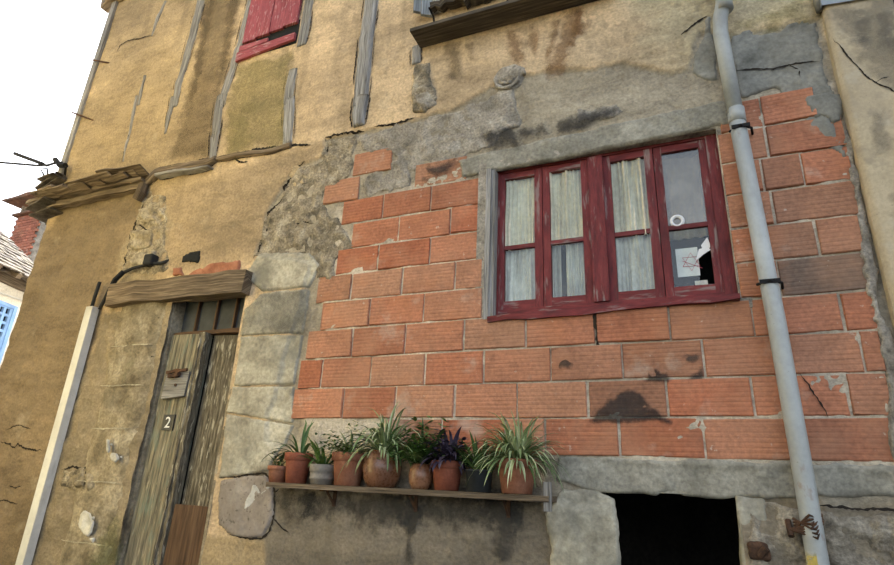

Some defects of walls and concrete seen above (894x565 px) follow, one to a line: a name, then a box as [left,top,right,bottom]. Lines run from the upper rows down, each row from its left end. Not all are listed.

crack [737,61,817,75]
crack [833,39,894,92]
flaking render [253,89,521,280]
flaking render [122,191,241,276]
damp [593,391,670,423]
crack [799,373,828,416]